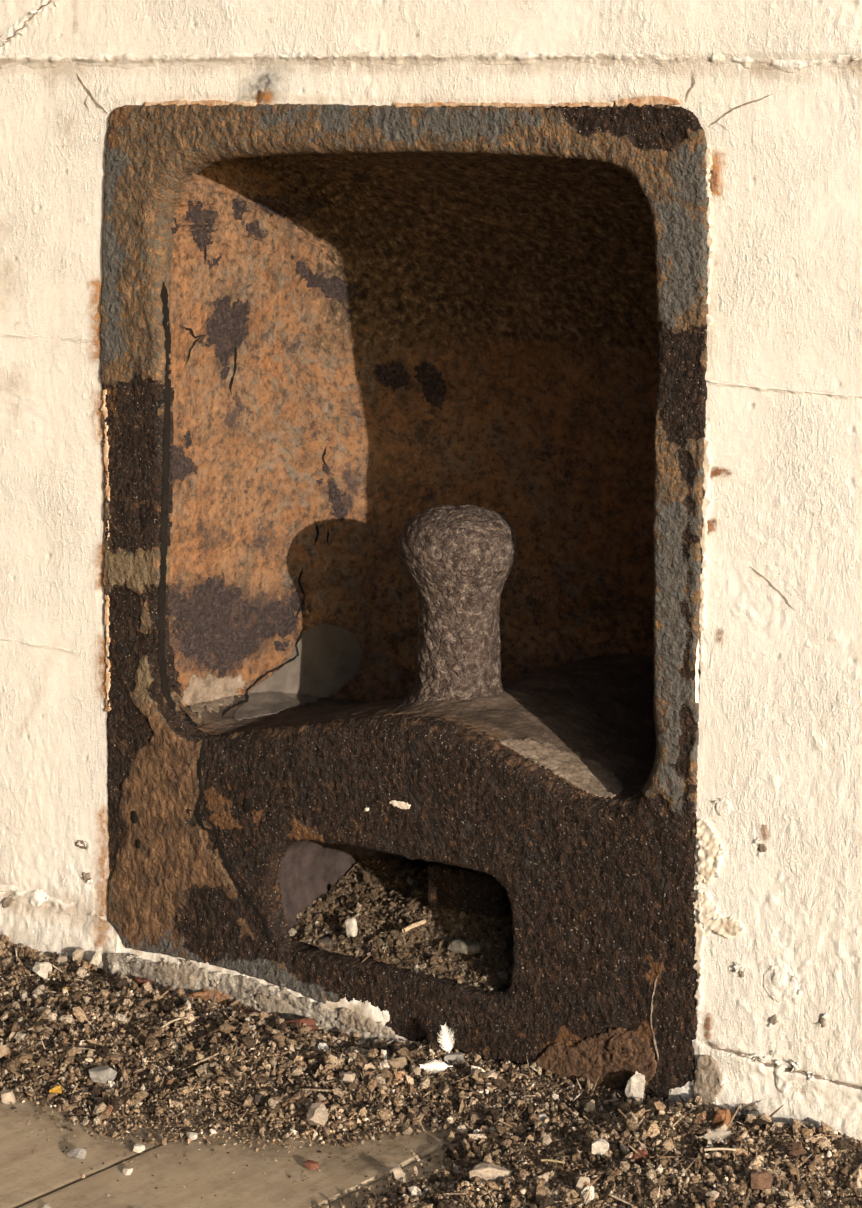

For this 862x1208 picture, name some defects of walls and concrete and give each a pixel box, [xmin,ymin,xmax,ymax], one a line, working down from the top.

crack [0,0,58,47]
crack [77,74,109,115]
corrosion [171,200,221,270]
corrosion [232,195,327,240]
corrosion [290,255,362,318]
corrosion [181,295,250,395]
corrosion [374,361,446,410]
corrosion [171,431,198,482]
corrosion [316,446,349,521]
corrosion [168,567,363,720]
corrosion [498,738,623,799]
corrosion [535,1027,658,1093]